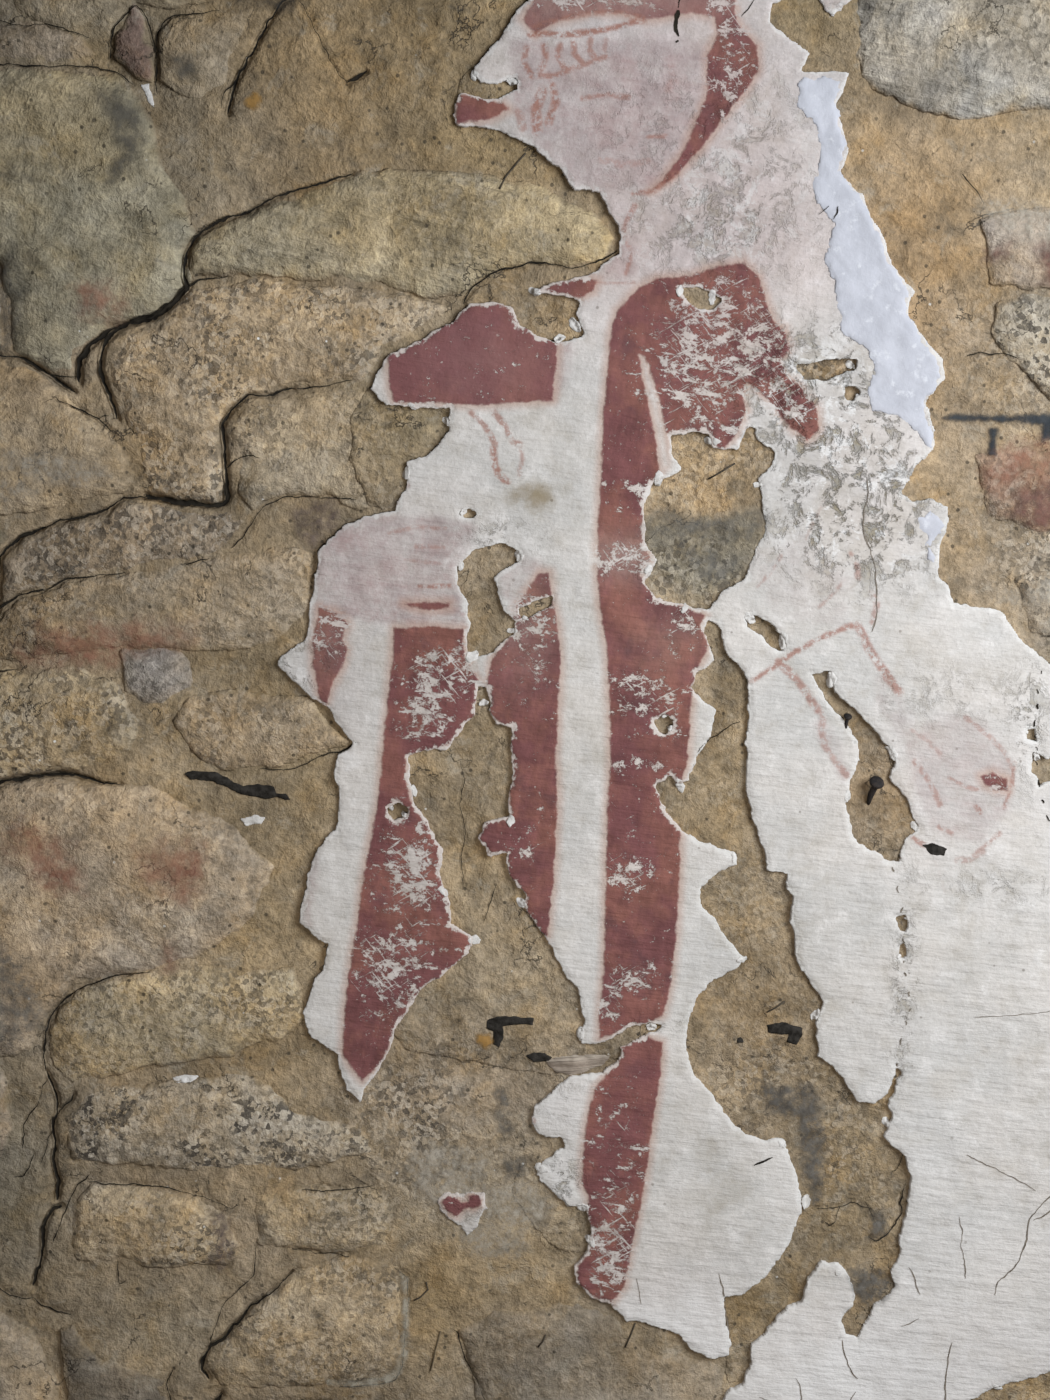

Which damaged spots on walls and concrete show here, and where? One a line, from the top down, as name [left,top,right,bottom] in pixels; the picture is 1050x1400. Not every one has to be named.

crack [221,0,367,114]
crack [0,174,352,432]
crack [463,251,617,304]
spalling [796,358,859,401]
crack [0,380,354,565]
spalling [457,543,553,663]
crack [0,772,120,785]
spalling [1026,729,1050,785]
spalling [643,427,919,1383]
crack [0,972,228,1315]
crack [166,1248,349,1400]
spalling [971,1372,1050,1400]